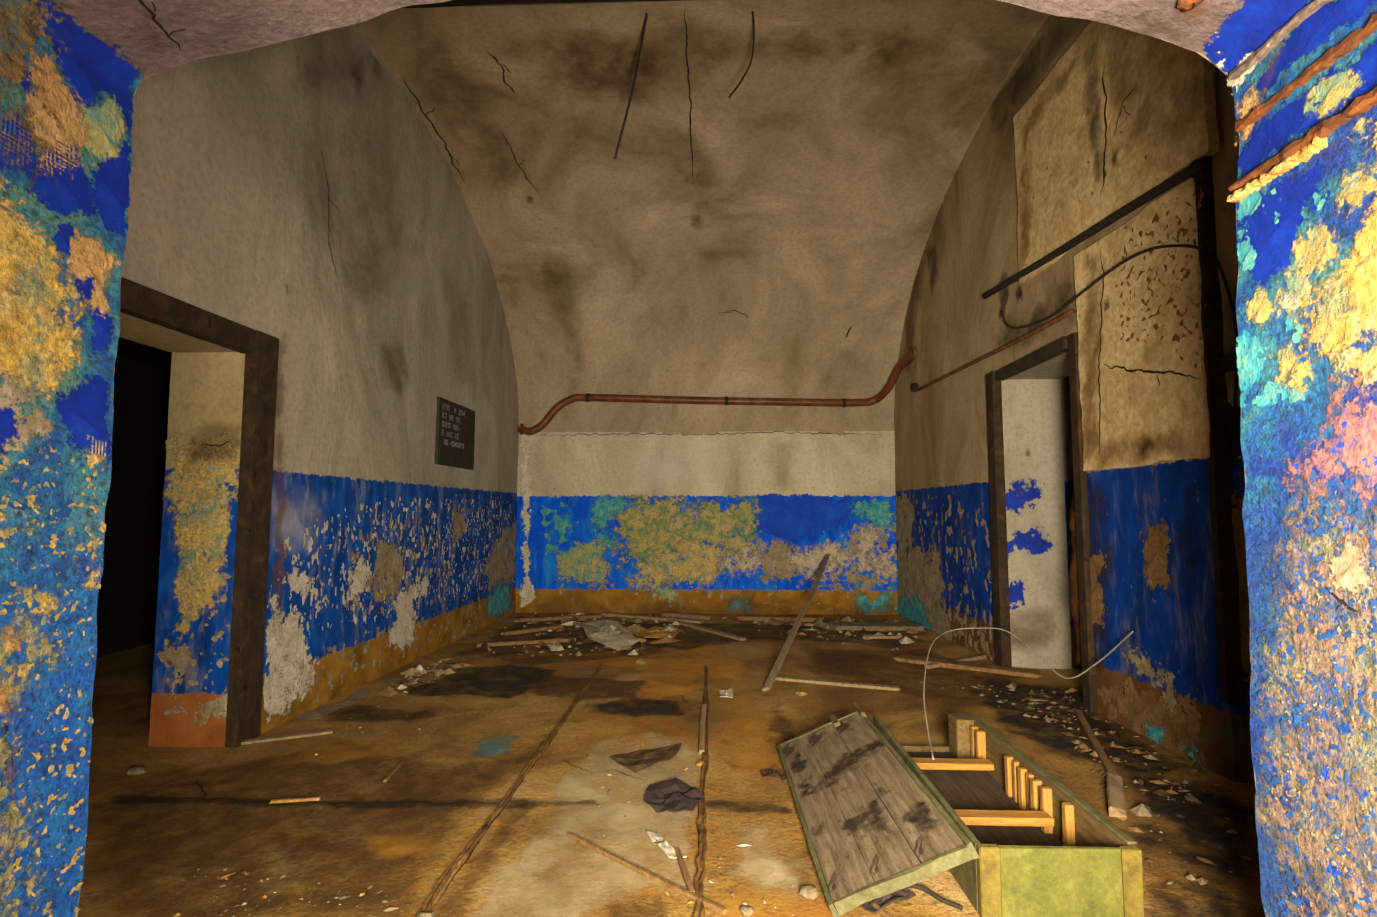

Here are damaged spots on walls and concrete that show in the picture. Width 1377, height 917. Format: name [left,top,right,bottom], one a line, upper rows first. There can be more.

crack [138,0,187,50]
crack [684,8,693,179]
peeling [1203,0,1377,176]
peeling [0,0,140,917]
peeling [156,432,240,726]
peeling [263,434,1025,732]
peeling [1005,478,1054,557]
peeling [1090,550,1108,629]
peeling [1139,517,1175,591]
peeling [1227,117,1377,917]